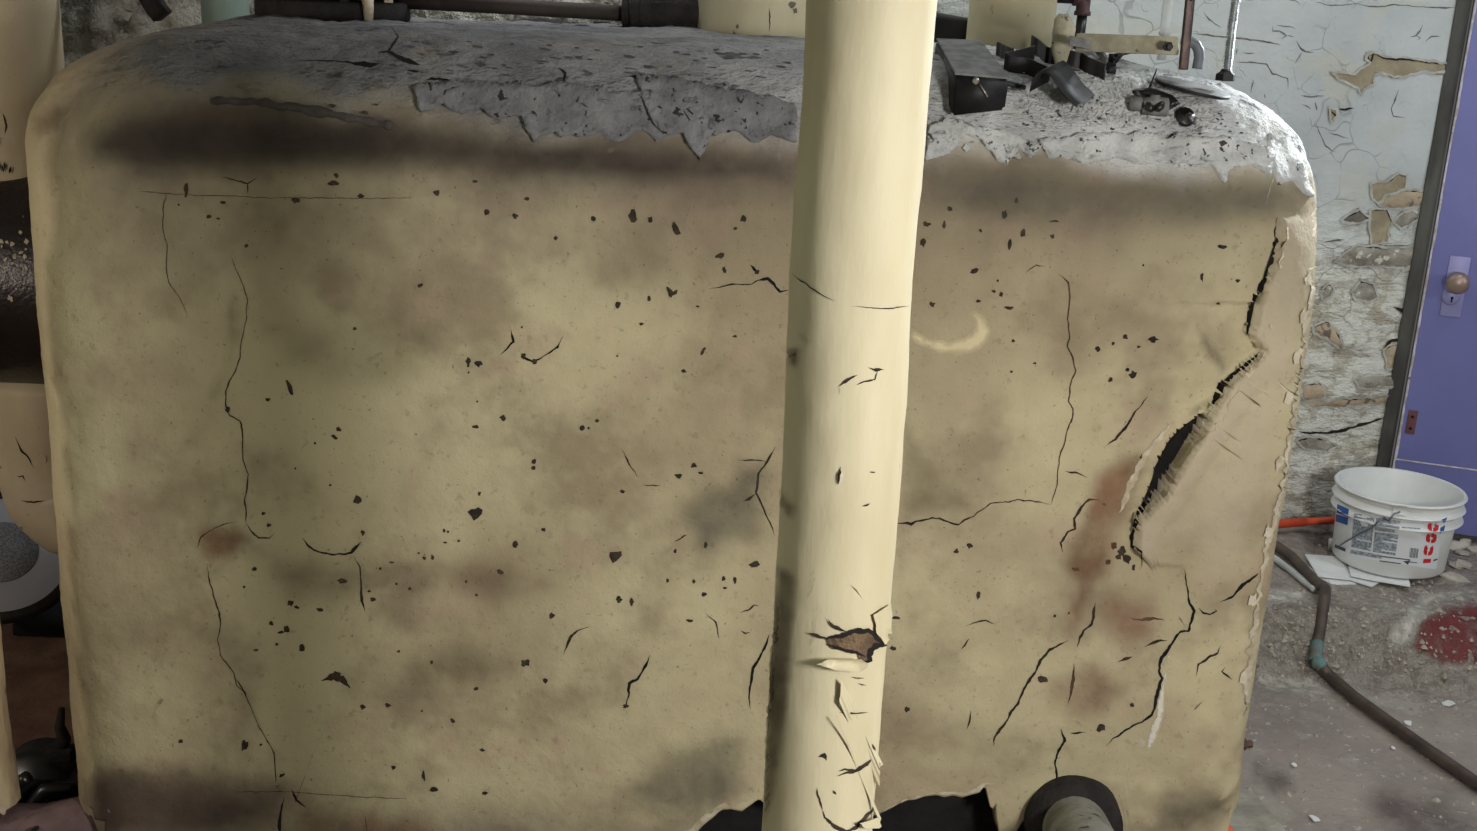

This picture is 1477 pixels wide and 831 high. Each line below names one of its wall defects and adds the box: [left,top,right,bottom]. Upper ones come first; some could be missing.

damp [101,124,468,159]
peeling [389,40,798,161]
peeling [1328,51,1447,124]
crack [141,177,394,309]
crack [710,265,906,309]
peeling [920,206,953,247]
crack [838,177,1279,567]
peeling [925,104,1424,718]
crack [197,255,404,831]
crack [967,573,1258,778]